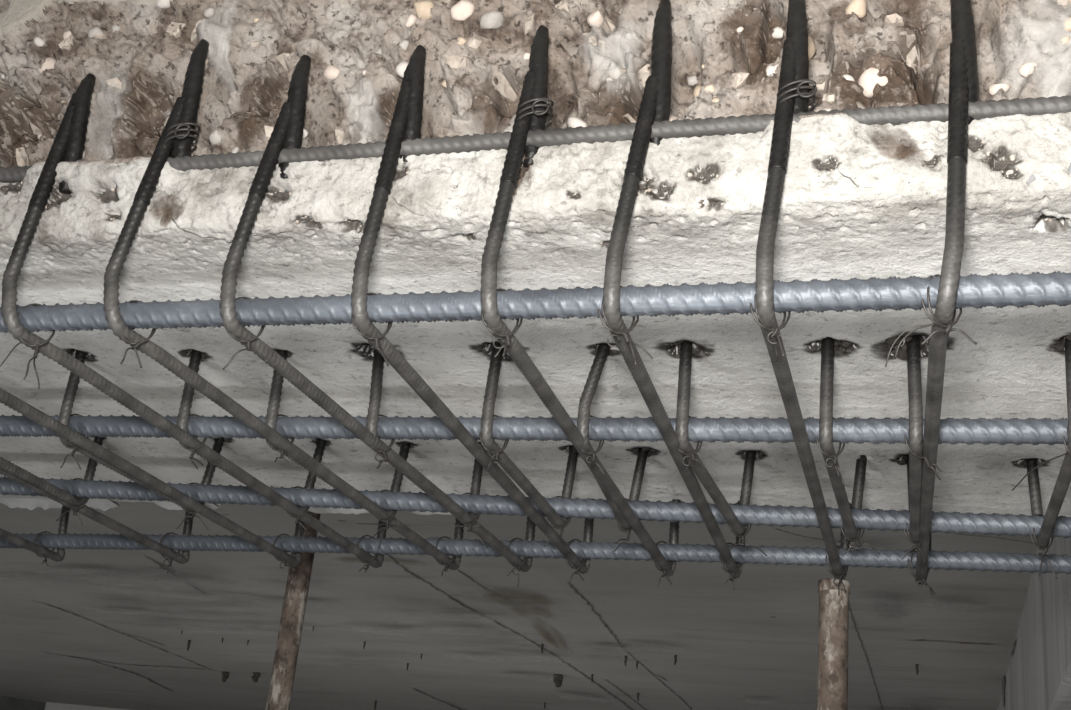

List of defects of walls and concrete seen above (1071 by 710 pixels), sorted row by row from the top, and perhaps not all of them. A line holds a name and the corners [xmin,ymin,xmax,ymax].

spalling [0,0,789,194]
spalling [793,0,952,126]
spalling [968,0,1071,120]
spalling [812,157,840,171]
spalling [922,155,941,167]
spalling [968,136,1036,186]
crack [32,600,213,692]
crack [385,554,646,710]
crack [566,582,691,709]